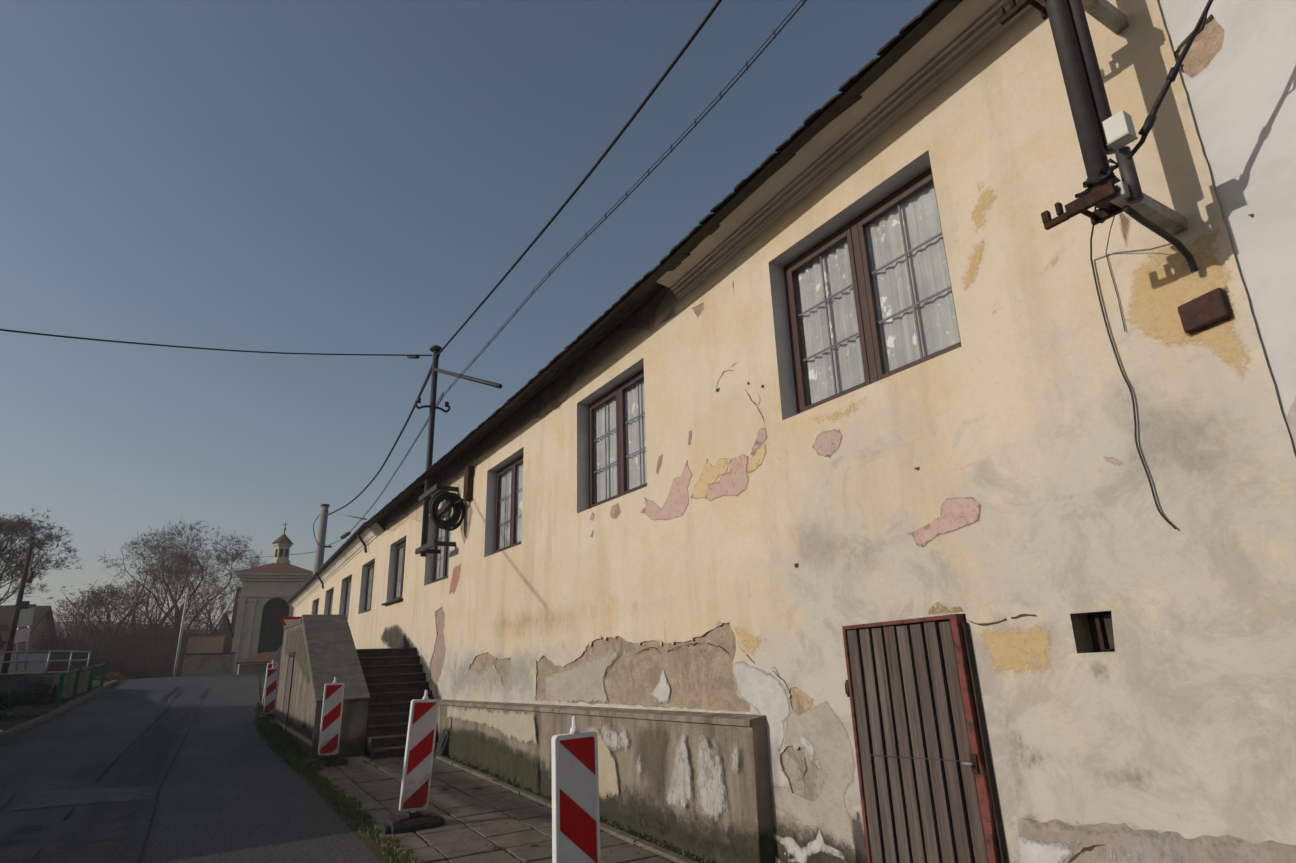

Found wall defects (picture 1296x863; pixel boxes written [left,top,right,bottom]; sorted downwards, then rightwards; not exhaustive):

spalling [1172,17,1225,79]
peeling [812,404,856,458]
spalling [1285,395,1296,457]
peeling [640,428,767,521]
peeling [910,497,981,547]
spalling [430,607,446,684]
spalling [470,652,511,686]
spalling [534,621,761,712]
spalling [787,687,814,715]
leakage [586,726,739,821]
spalling [782,744,825,802]